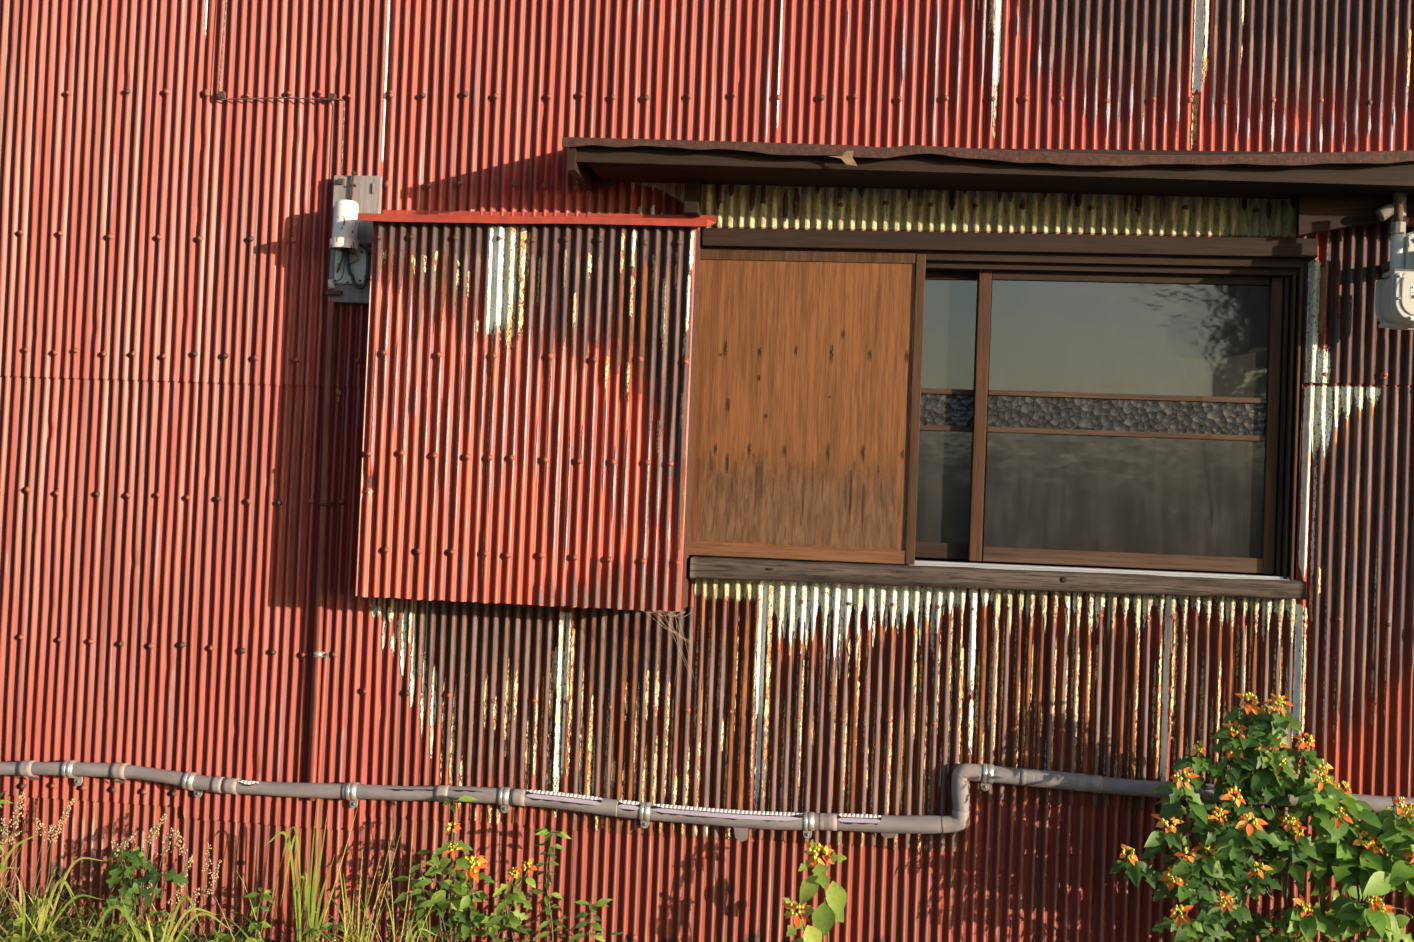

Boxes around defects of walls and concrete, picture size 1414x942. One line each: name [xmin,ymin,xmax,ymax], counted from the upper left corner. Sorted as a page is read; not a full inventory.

peeling [411,251,438,274]
peeling [456,260,471,297]
peeling [476,225,541,475]
peeling [563,250,576,327]
peeling [605,355,630,398]
peeling [620,182,694,359]
corrosion [371,221,1414,854]
peeling [1271,260,1381,750]
peeling [449,686,463,809]
peeling [483,580,1046,815]
peeling [1056,622,1091,774]
peeling [1103,595,1227,796]